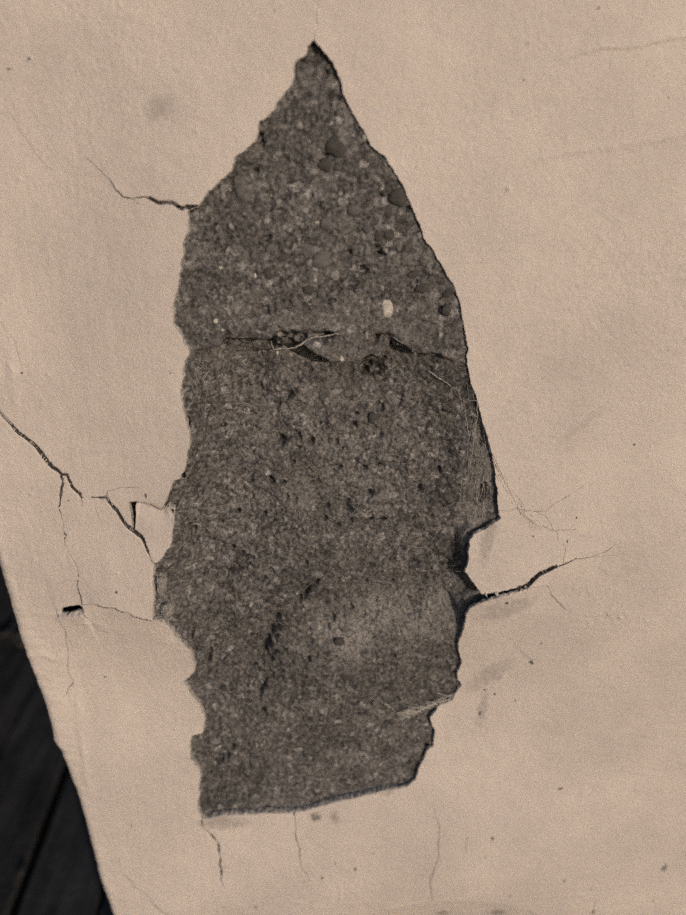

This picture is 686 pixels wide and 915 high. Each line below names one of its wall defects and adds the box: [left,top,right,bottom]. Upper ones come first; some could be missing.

crack [87,158,198,210]
crack [0,412,152,633]
flaking render [128,40,527,819]
crack [498,484,618,612]